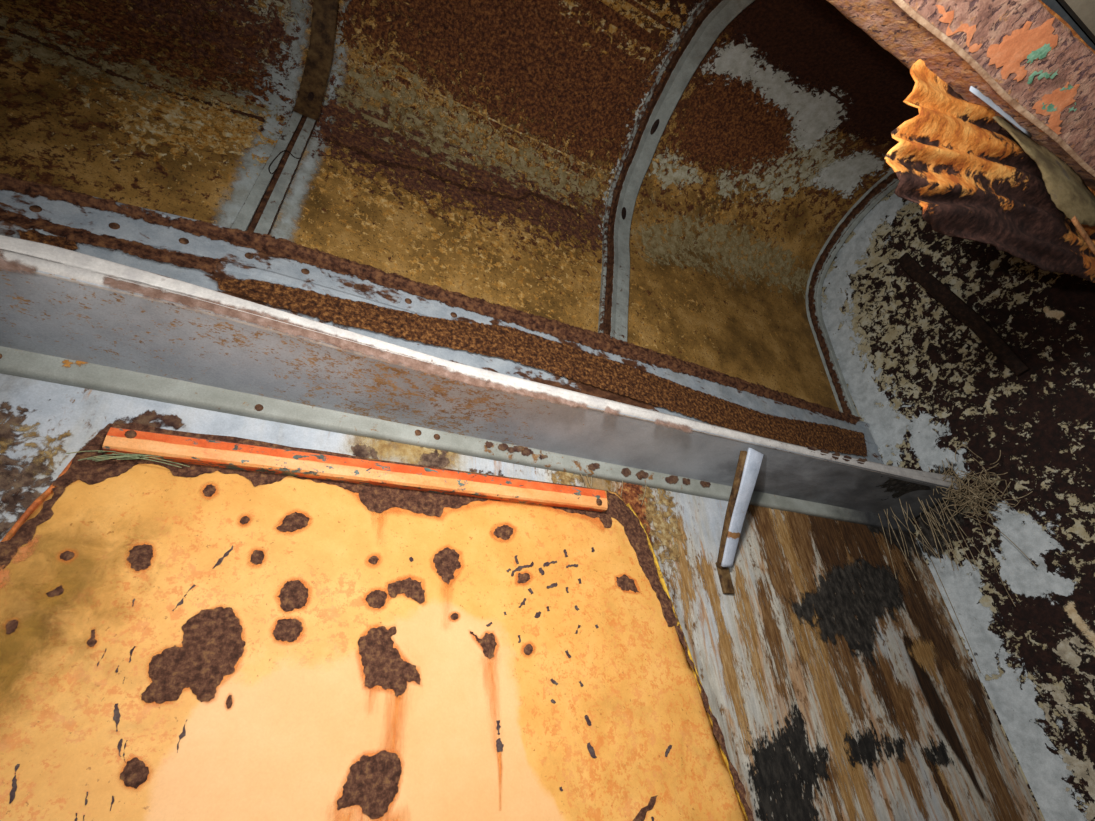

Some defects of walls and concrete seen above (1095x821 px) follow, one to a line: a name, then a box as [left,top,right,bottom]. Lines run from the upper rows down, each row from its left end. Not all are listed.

corrosion [311,0,701,268]
corrosion [662,0,919,188]
peeling [936,5,1080,135]
corrosion [0,173,867,464]
peeling [1043,306,1065,320]
corrosion [0,402,71,539]
corrosion [141,607,245,709]
corrosion [336,626,421,821]
corrosion [551,463,1023,821]
damp [745,704,833,821]
damp [844,720,958,782]
peeling [916,501,1095,821]